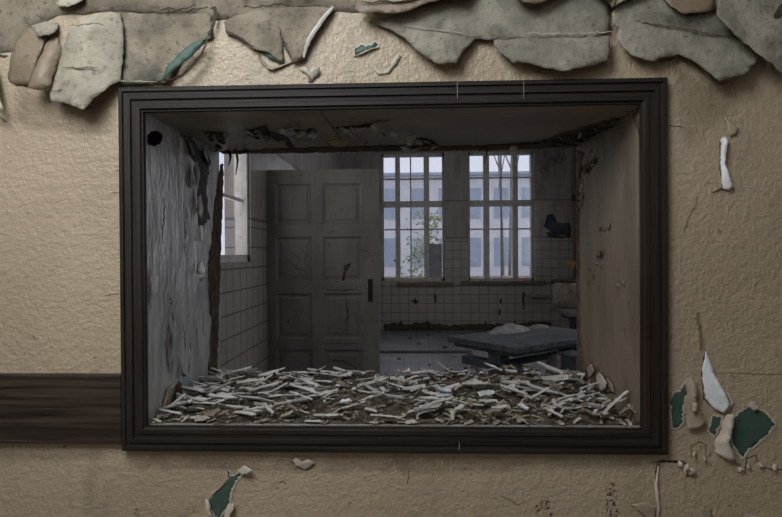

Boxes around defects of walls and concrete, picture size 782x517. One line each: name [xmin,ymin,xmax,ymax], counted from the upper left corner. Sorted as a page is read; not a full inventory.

peeling [712,117,739,192]
flaking render [159,117,640,425]
peeling [668,349,776,464]
peeling [205,462,252,517]